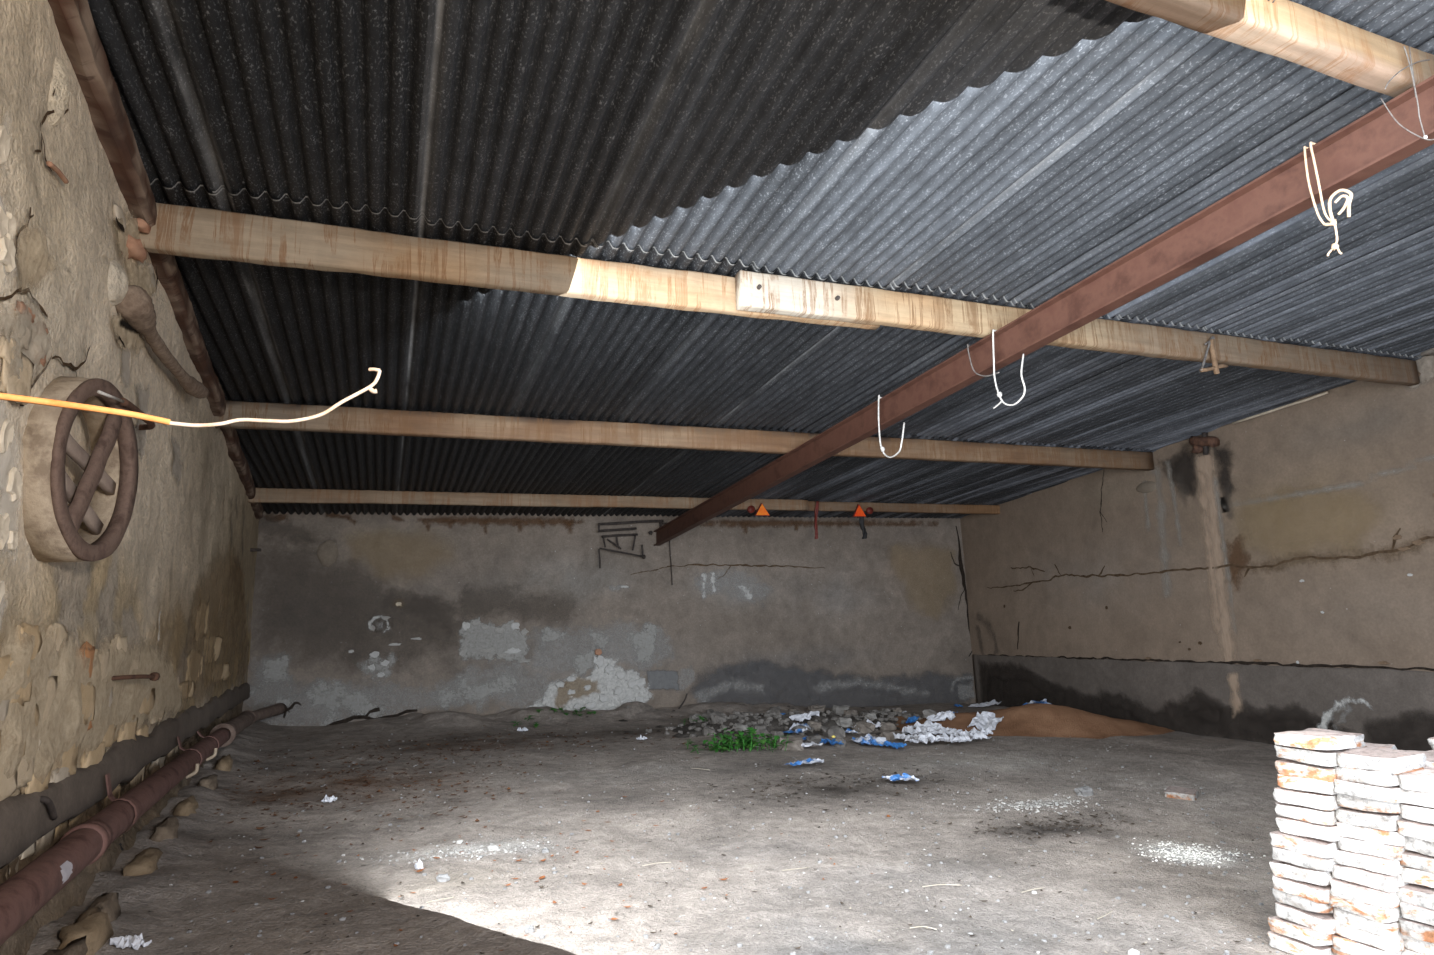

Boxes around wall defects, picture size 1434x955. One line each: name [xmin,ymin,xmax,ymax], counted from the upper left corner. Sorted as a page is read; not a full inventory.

crack [35,88,68,171]
damp [694,447,1369,745]
crack [950,473,1434,671]
flaking render [459,617,531,664]
flaking render [527,649,653,711]
damp [1366,712,1434,751]